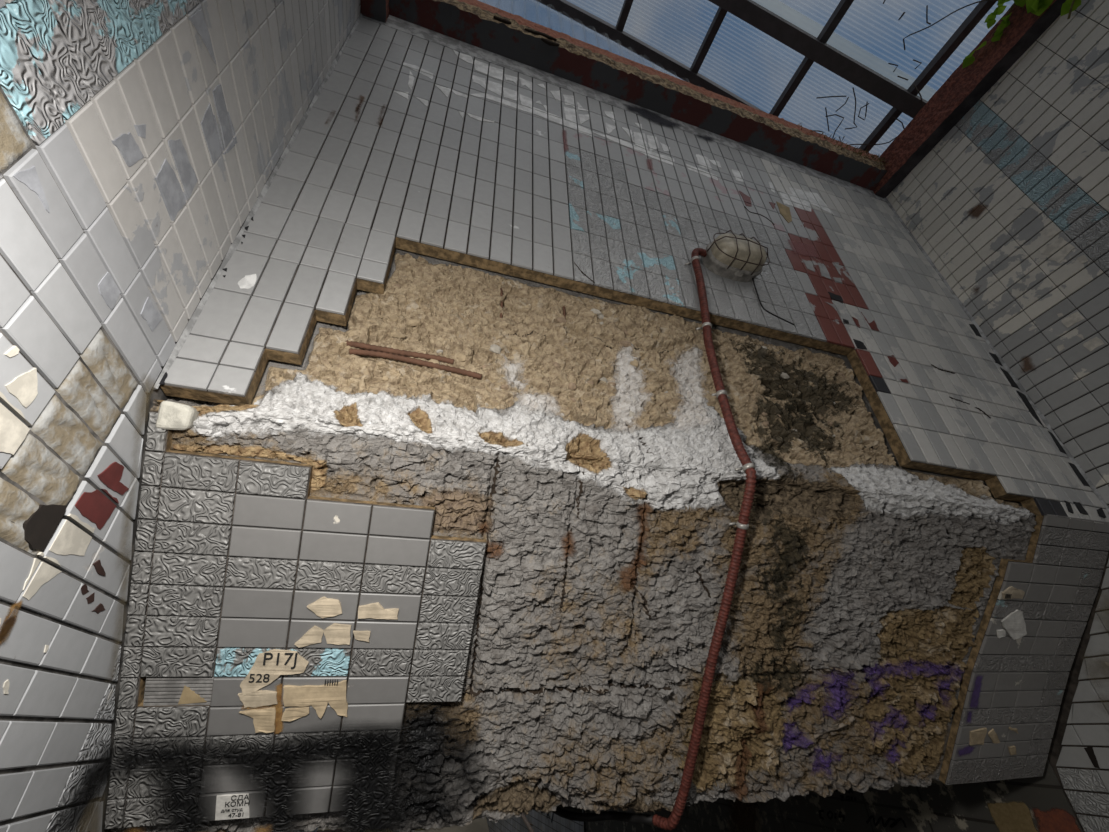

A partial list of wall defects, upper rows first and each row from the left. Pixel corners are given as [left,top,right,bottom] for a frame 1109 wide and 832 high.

corrosion [0,601,22,644]
peeling [0,329,138,600]
spalling [81,584,105,614]
crack [442,453,500,546]
crack [559,472,584,612]
spalling [173,253,1025,522]
crack [631,502,651,619]
crack [463,571,960,697]
water stain [729,337,859,482]
spalling [859,546,997,776]
water stain [61,729,400,832]
spalling [673,673,787,796]